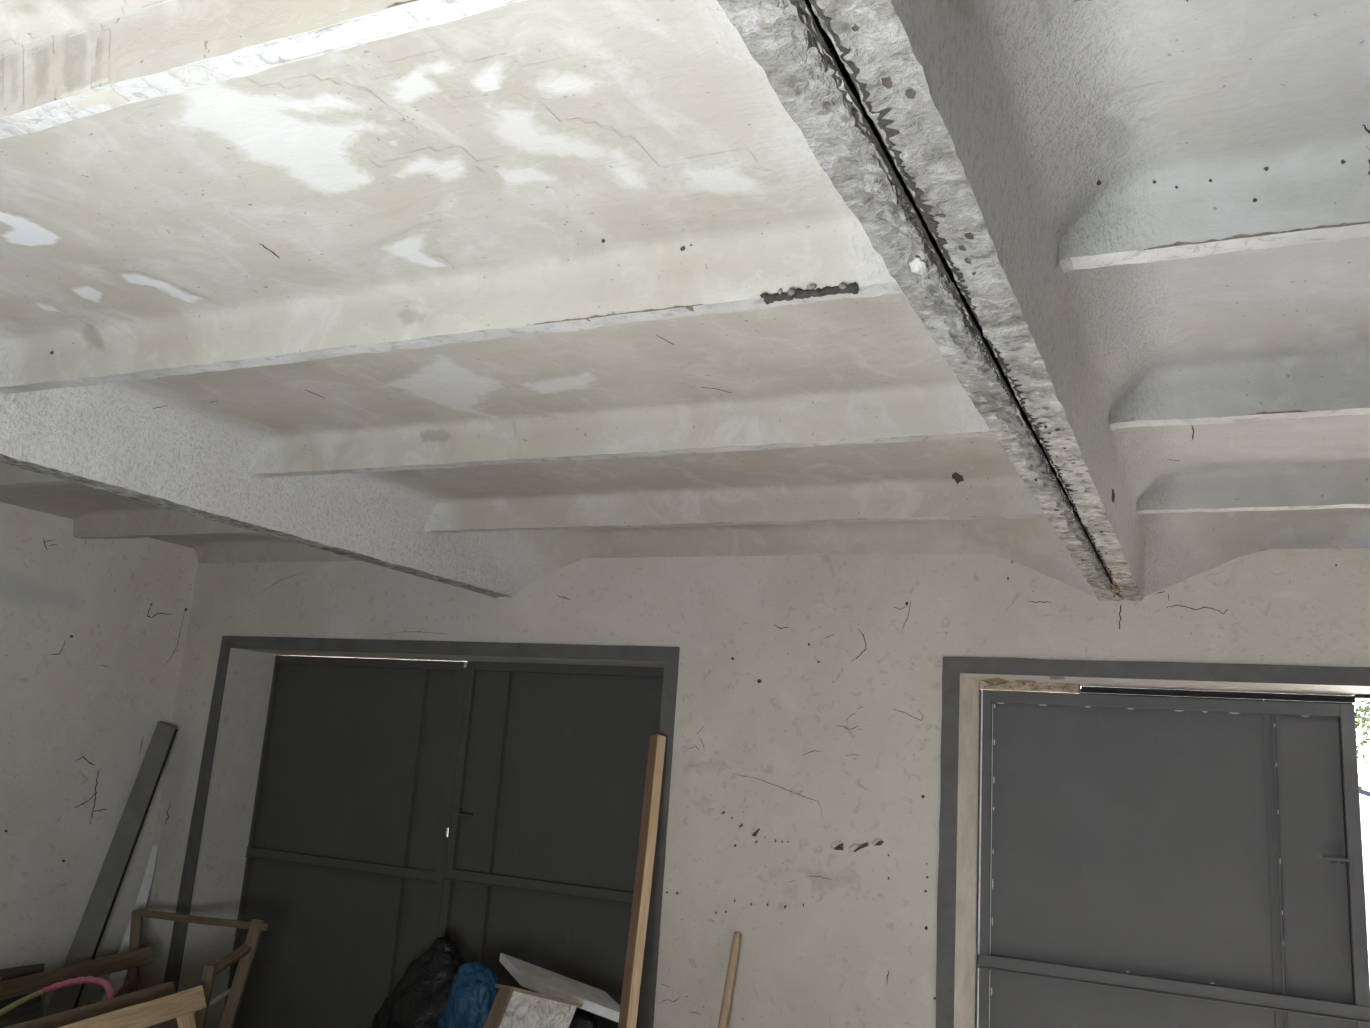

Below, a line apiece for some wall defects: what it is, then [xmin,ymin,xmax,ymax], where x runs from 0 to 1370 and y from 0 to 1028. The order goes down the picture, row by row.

spalling [760,282,859,305]
spalling [533,304,703,325]
crack [761,0,1122,629]
spalling [951,471,965,486]
crack [1156,591,1228,614]
crack [689,727,822,814]
crack [74,756,106,825]
spalling [830,838,889,857]